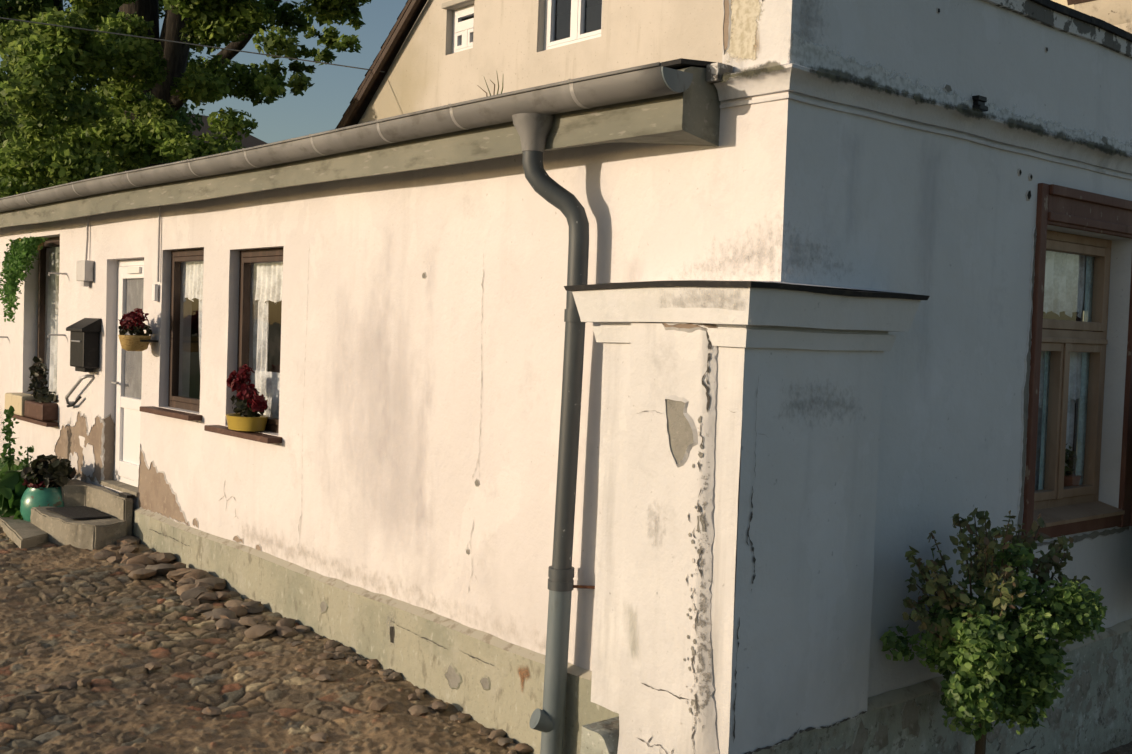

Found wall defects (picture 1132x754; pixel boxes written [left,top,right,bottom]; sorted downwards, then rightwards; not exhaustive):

flaking render [723,0,732,55]
flaking render [1017,168,1033,201]
flaking render [54,410,115,485]
flaking render [138,444,199,528]
flaking render [665,395,712,732]
crack [636,327,765,754]
crack [733,617,867,754]